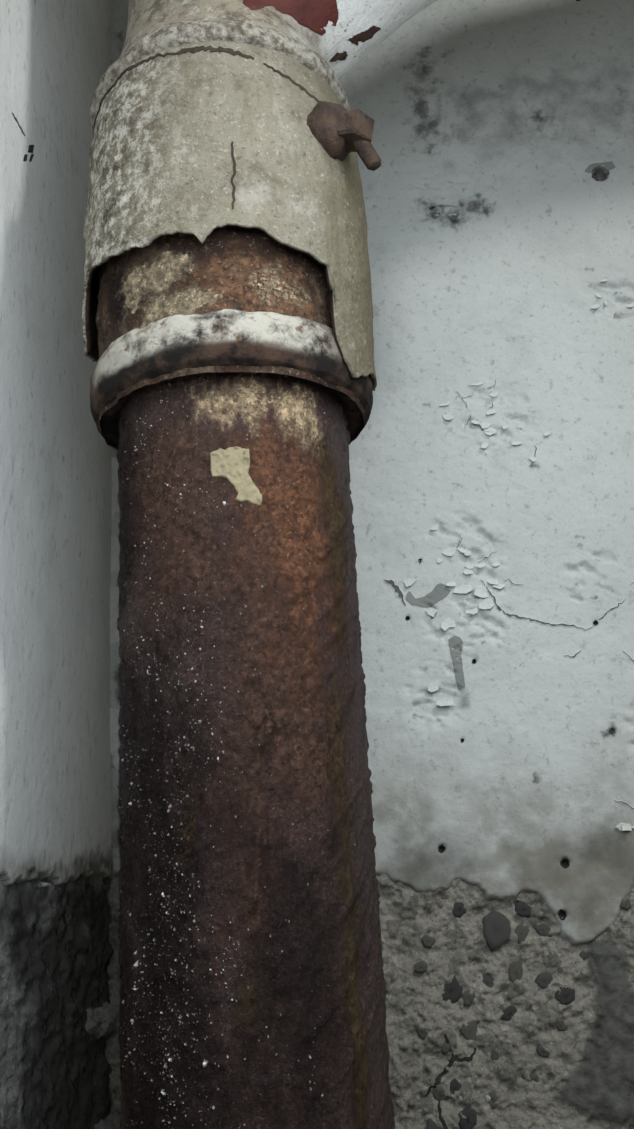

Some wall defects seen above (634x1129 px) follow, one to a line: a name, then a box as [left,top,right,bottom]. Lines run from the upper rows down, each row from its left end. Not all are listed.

flaking render [439,380,551,467]
peeling [403,534,523,706]
crack [480,580,634,658]
peeling [615,823,634,831]
leakage [12,883,114,1129]
spalling [376,874,634,1129]